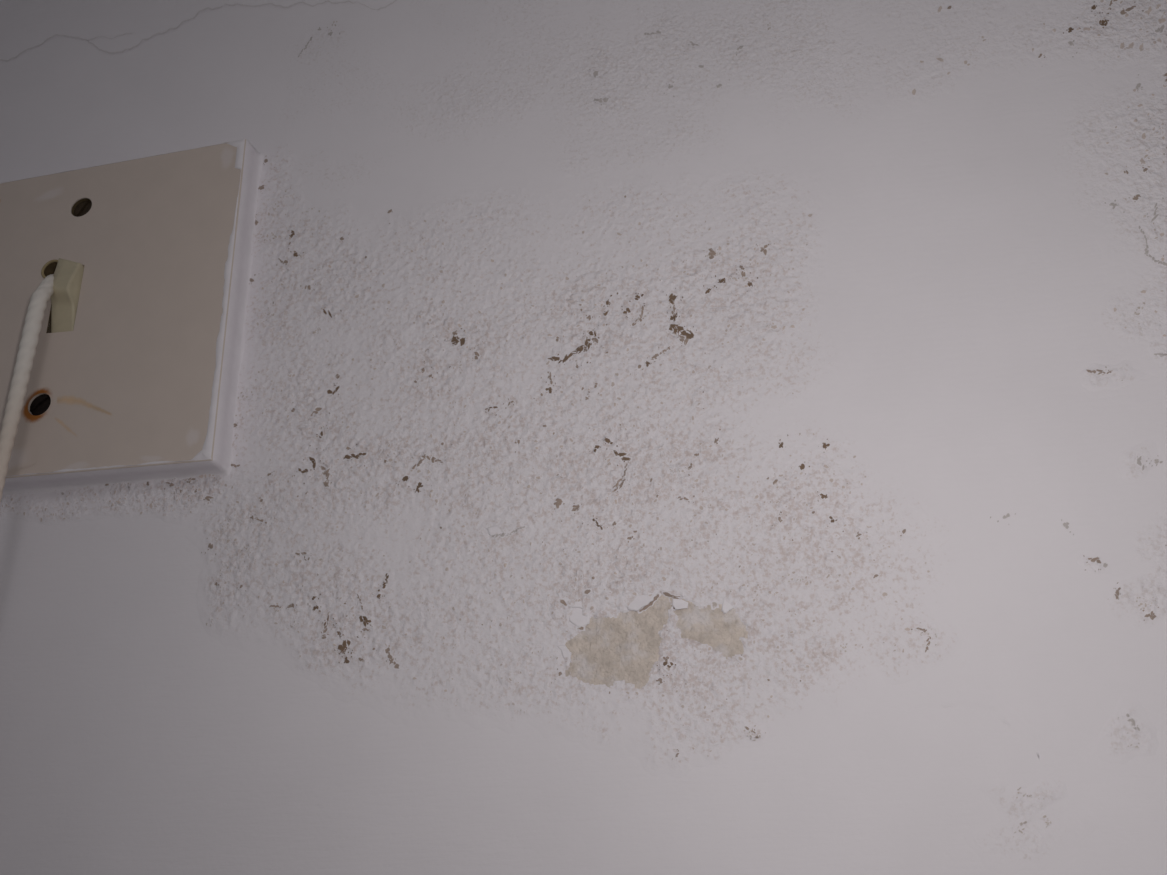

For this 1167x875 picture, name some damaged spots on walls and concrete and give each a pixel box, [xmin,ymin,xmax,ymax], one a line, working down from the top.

crack [0,0,357,62]
peeling [557,588,748,689]